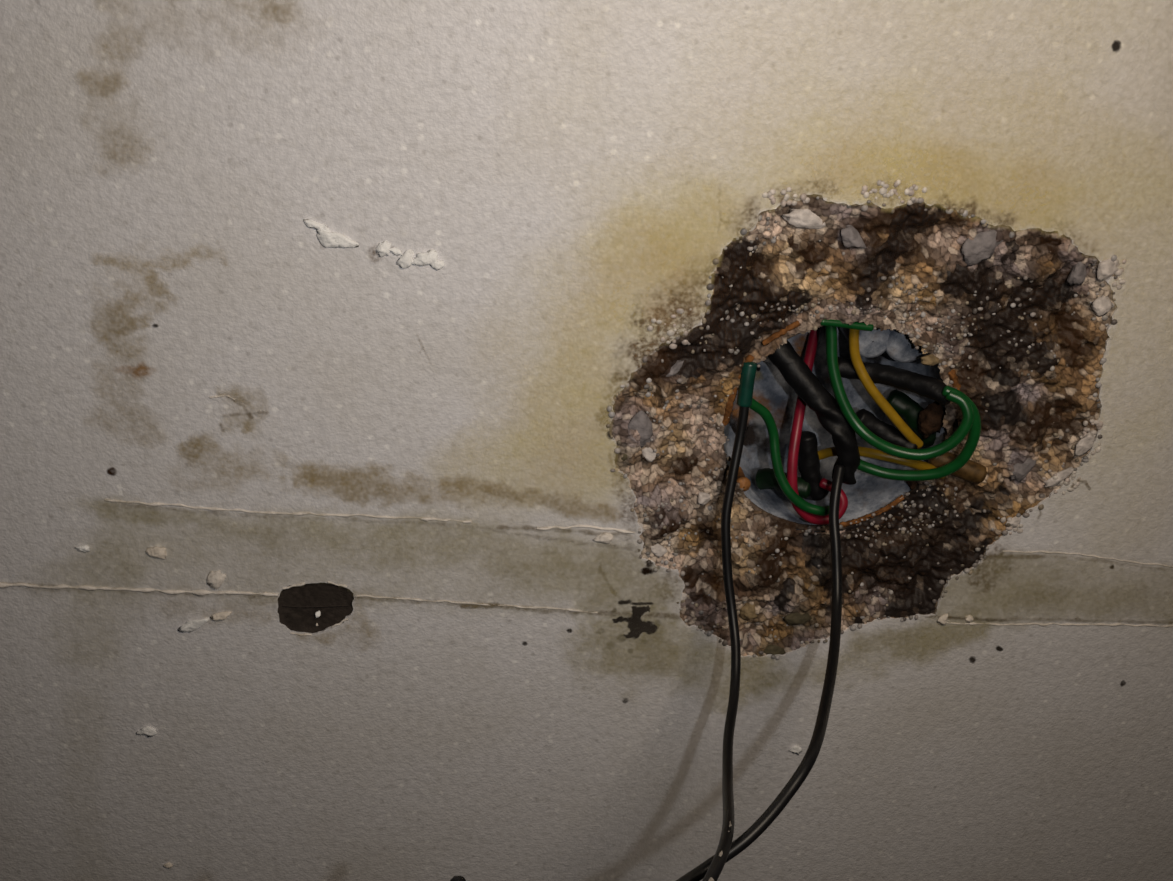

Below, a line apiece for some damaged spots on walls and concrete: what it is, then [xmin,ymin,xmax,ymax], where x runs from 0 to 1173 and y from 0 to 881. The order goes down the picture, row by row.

spalling [599,179,1127,660]